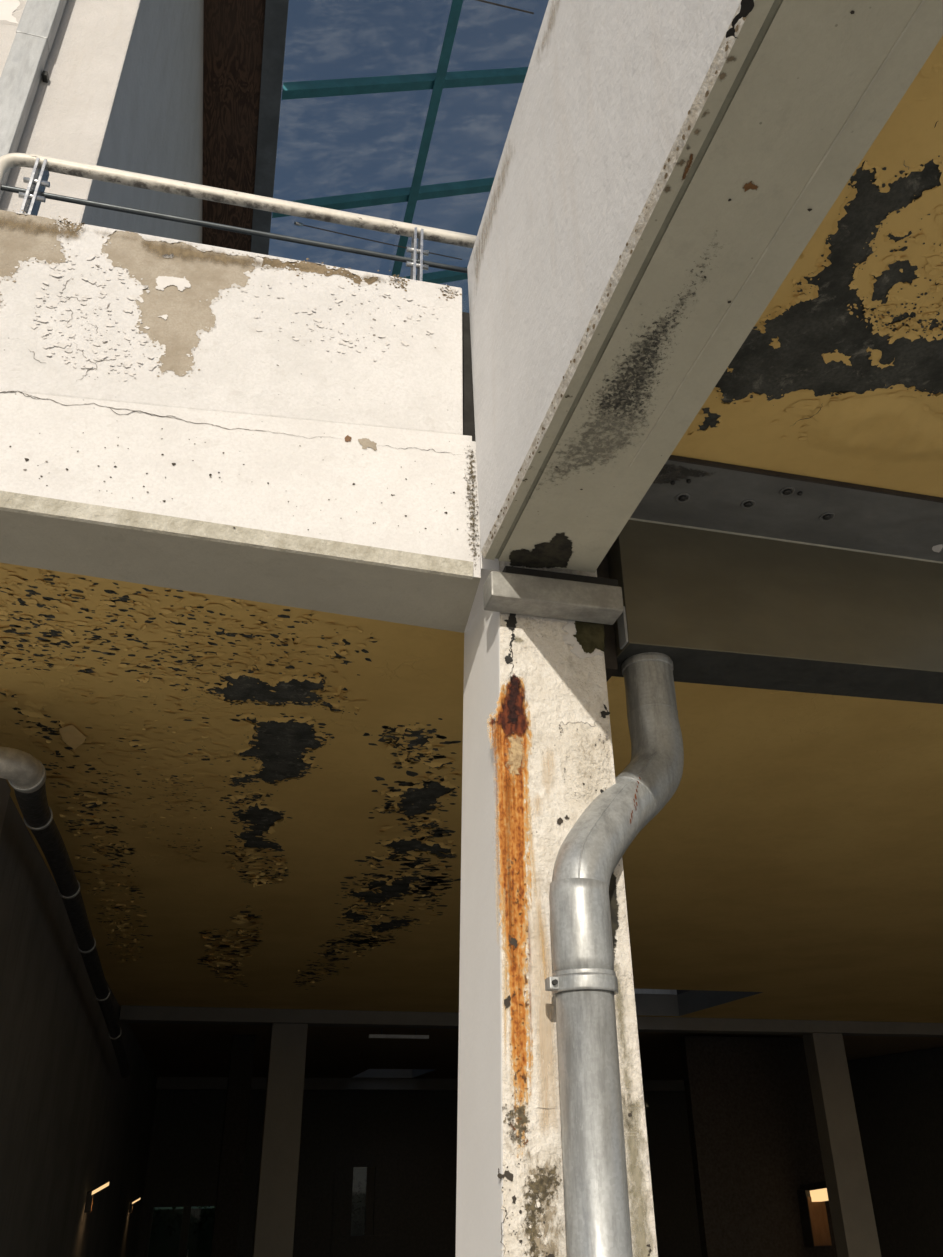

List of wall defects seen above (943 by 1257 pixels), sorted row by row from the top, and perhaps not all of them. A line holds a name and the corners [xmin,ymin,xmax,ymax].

flaking render [0,0,25,25]
crack [0,280,340,439]
water stain [555,258,709,473]
peeling [688,156,943,440]
peeling [0,564,378,887]
peeling [292,718,462,990]
corrosion [487,674,544,1148]
water stain [502,1103,563,1257]